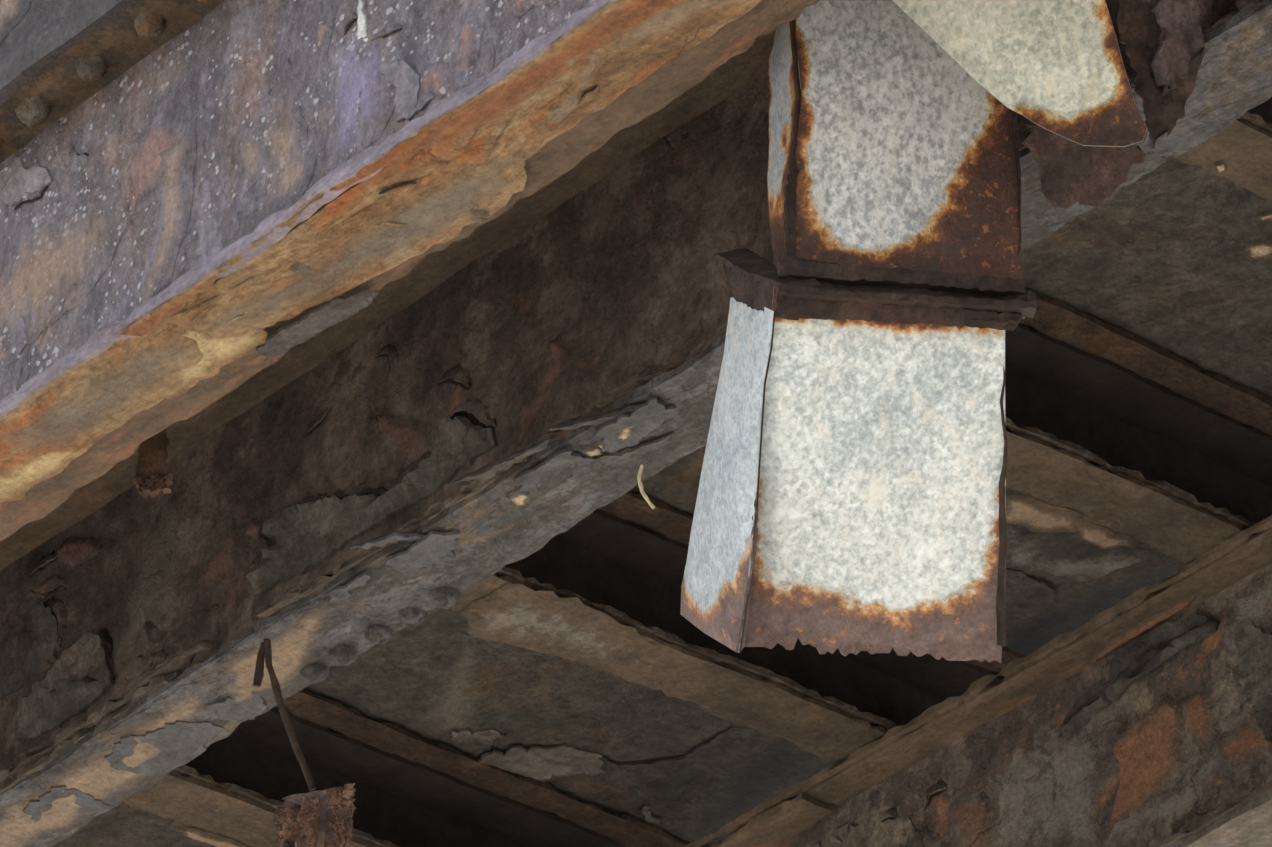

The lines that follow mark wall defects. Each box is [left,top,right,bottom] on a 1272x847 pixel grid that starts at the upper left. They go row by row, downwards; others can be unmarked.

rust [0,0,30,44]
rust [0,189,132,370]
rust [119,0,754,399]
rust [767,0,1147,279]
peeling [326,570,370,603]
rust [680,470,1134,664]
peeling [450,727,506,745]
rust [1110,679,1272,832]